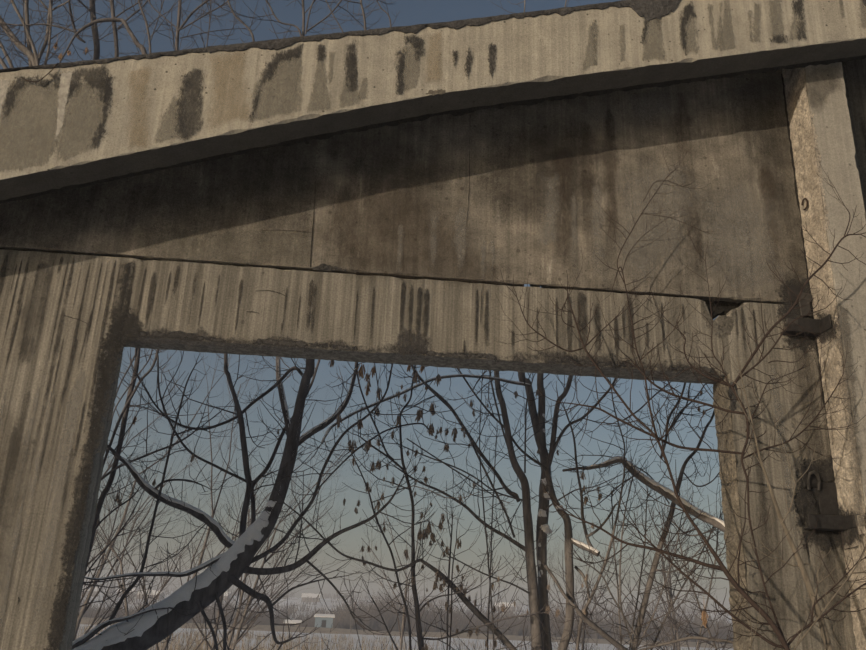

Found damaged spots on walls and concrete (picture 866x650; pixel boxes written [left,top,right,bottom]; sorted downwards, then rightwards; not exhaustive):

leakage [680,4,697,54]
leakage [748,0,806,43]
leakage [396,34,424,94]
leakage [453,48,473,80]
leakage [488,43,497,77]
leakage [0,65,113,171]
leakage [156,69,203,142]
leakage [124,267,156,319]
leakage [394,283,430,355]
leakage [463,290,488,354]
leakage [555,292,601,350]
leakage [0,258,116,598]